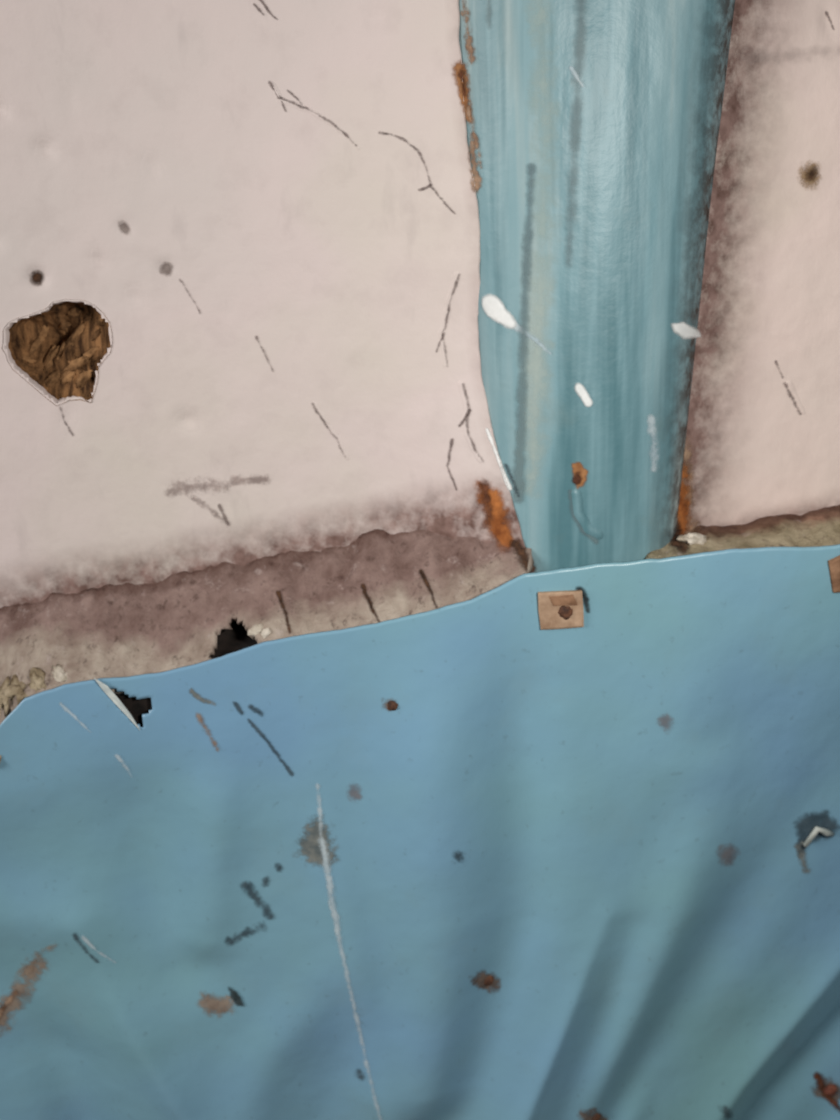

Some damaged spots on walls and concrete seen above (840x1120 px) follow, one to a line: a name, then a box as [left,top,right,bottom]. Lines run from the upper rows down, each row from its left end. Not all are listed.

crack [269,81,454,213]
spalling [2,298,114,407]
rust [477,481,536,572]
spalling [0,663,67,718]
rust [0,946,51,1030]
rust [199,987,244,1014]
rust [471,971,500,992]
rust [813,1072,840,1111]